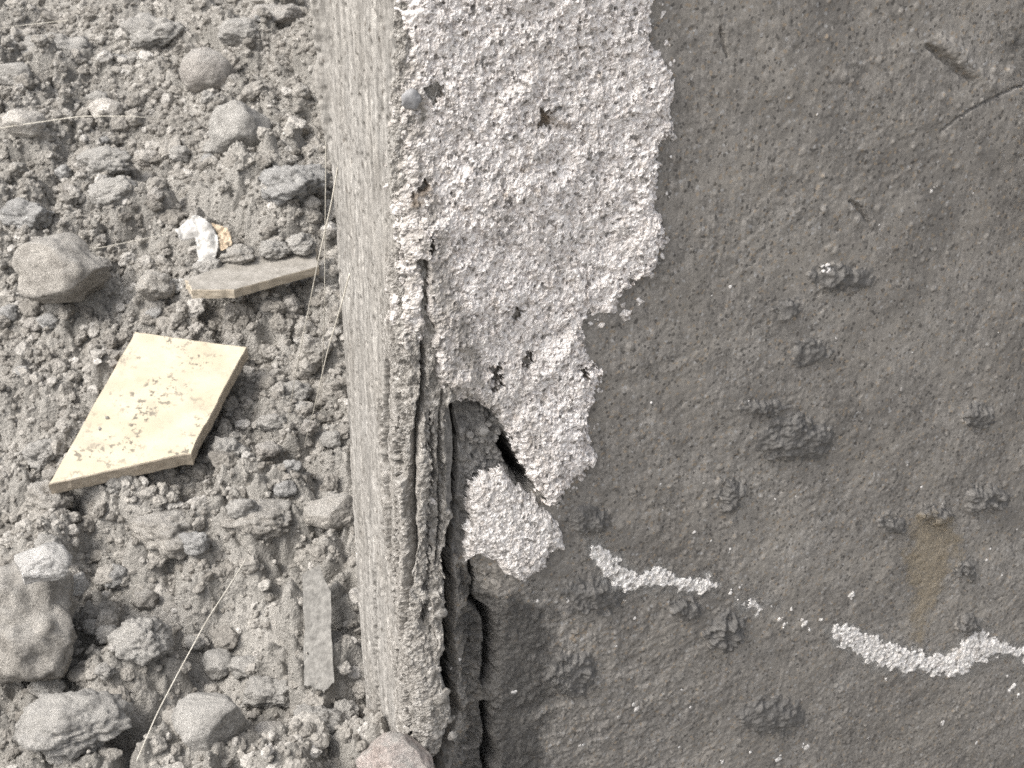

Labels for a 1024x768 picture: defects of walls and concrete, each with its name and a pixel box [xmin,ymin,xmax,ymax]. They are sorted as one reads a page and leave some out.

crack [448,403,457,492]
spalling [378,0,677,757]
crack [440,514,476,707]